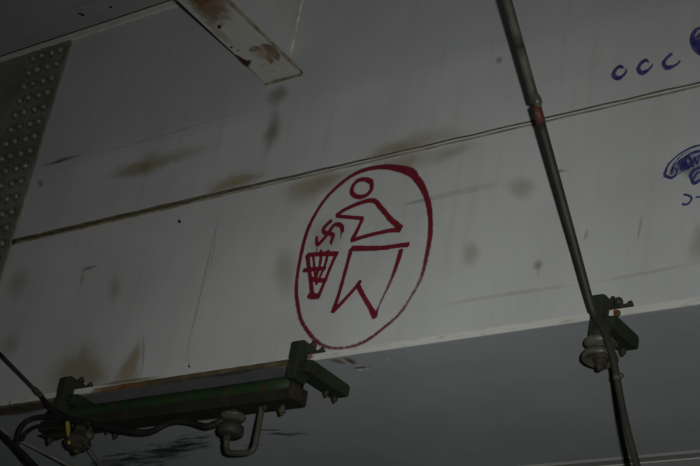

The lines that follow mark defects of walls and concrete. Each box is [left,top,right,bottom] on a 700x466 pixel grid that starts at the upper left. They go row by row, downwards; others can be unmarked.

rust [191,0,225,22]
rust [250,44,280,71]